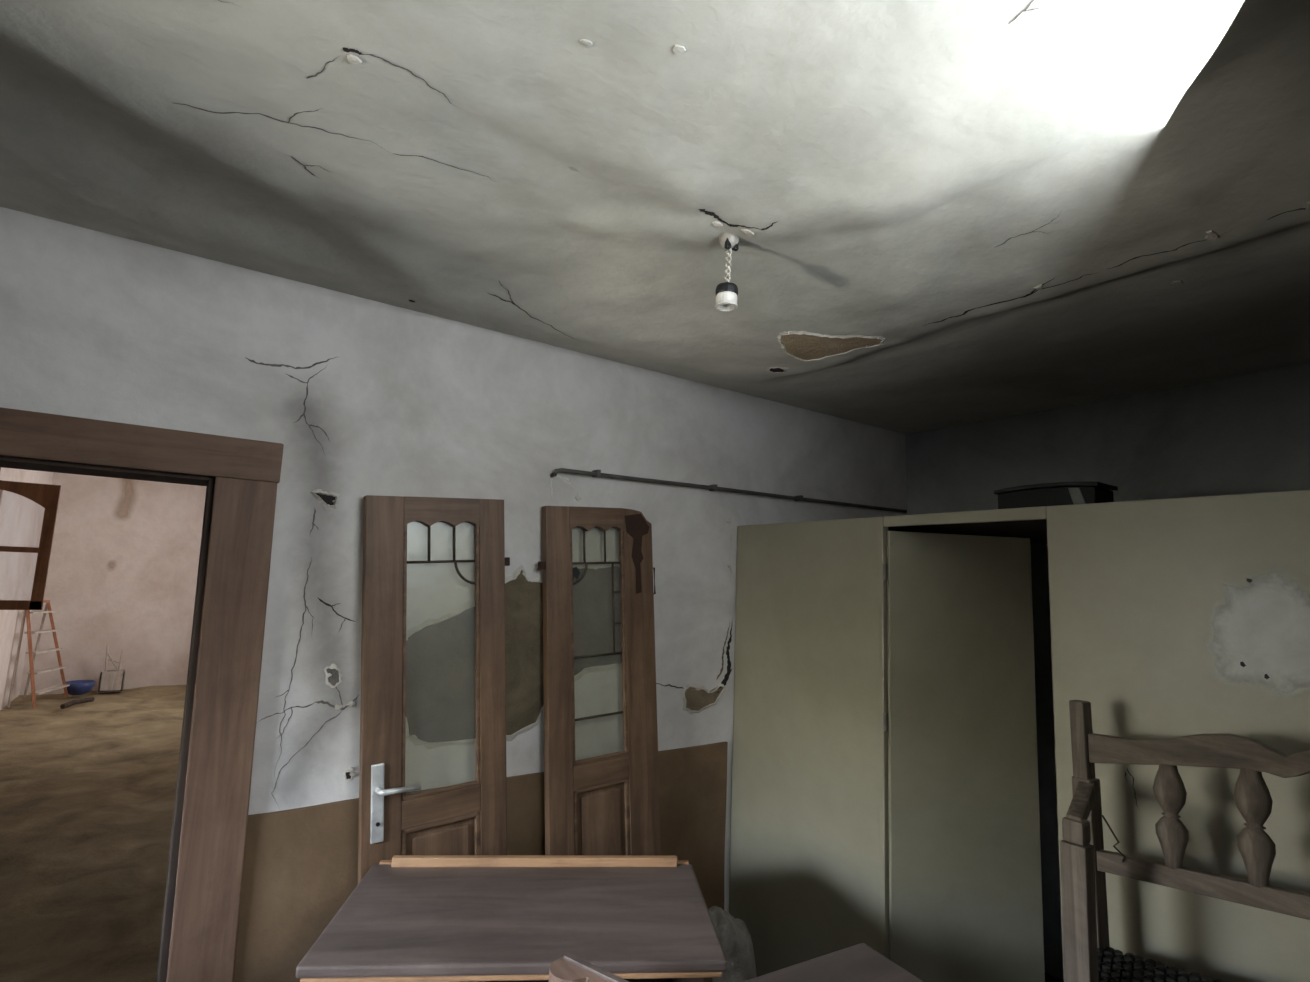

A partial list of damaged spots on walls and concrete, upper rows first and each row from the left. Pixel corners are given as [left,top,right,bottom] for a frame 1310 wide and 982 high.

crack [306,47,452,104]
crack [175,103,495,182]
crack [699,209,778,237]
crack [994,212,1061,248]
crack [923,230,1230,326]
flaking render [767,331,886,373]
crack [245,357,336,452]
crack [257,509,360,806]
flaking render [405,599,476,750]
flaking render [505,565,544,741]
flaking render [572,564,622,682]
flaking render [656,620,733,714]